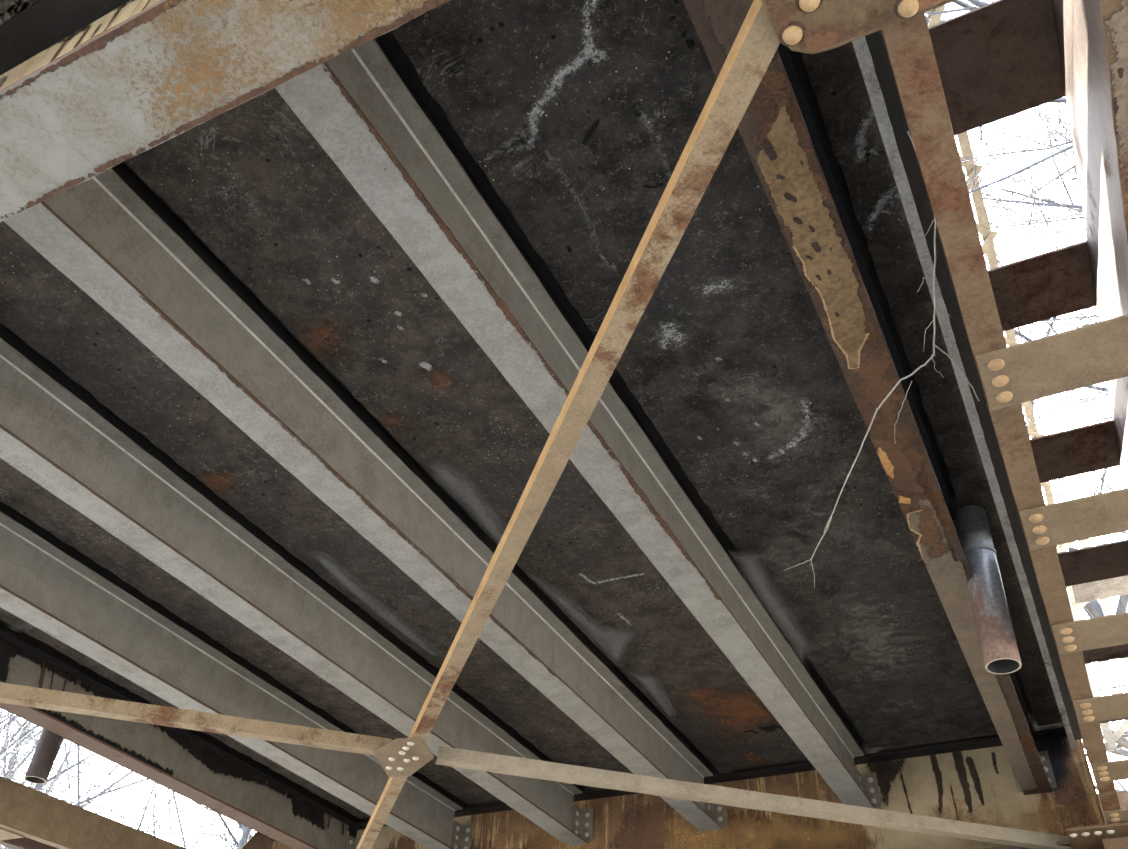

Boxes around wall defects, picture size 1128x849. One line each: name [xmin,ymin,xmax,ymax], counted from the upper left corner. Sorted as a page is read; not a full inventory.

peeling [700,0,753,56]
crack [490,0,613,267]
peeling [1104,0,1128,190]
corrosion [0,0,569,397]
peeling [748,50,1037,791]
corrosion [587,420,722,600]
damp [0,637,114,699]
damp [36,708,175,776]
damp [150,724,333,831]
corrosion [386,836,428,849]
corrosion [608,794,878,849]
damp [930,751,984,820]